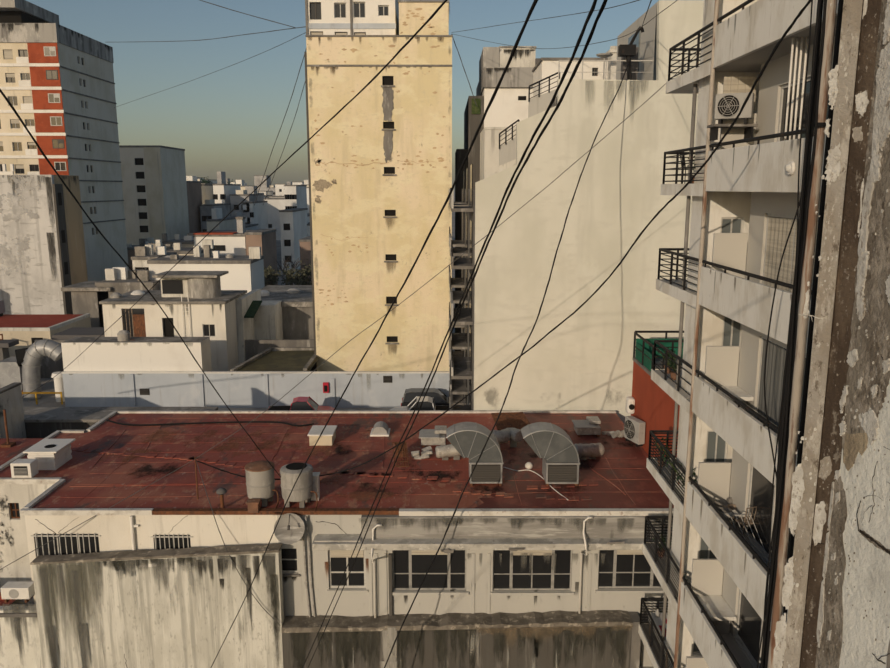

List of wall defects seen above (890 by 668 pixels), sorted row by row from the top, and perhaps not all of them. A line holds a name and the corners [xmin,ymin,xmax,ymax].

water stain [0,174,78,275]
flaking render [789,0,890,668]
mould [0,498,13,546]
crack [856,446,890,555]
water stain [3,554,296,666]
water stain [291,631,380,668]
water stain [396,629,478,668]
water stain [519,626,628,668]
peeling [773,555,799,668]